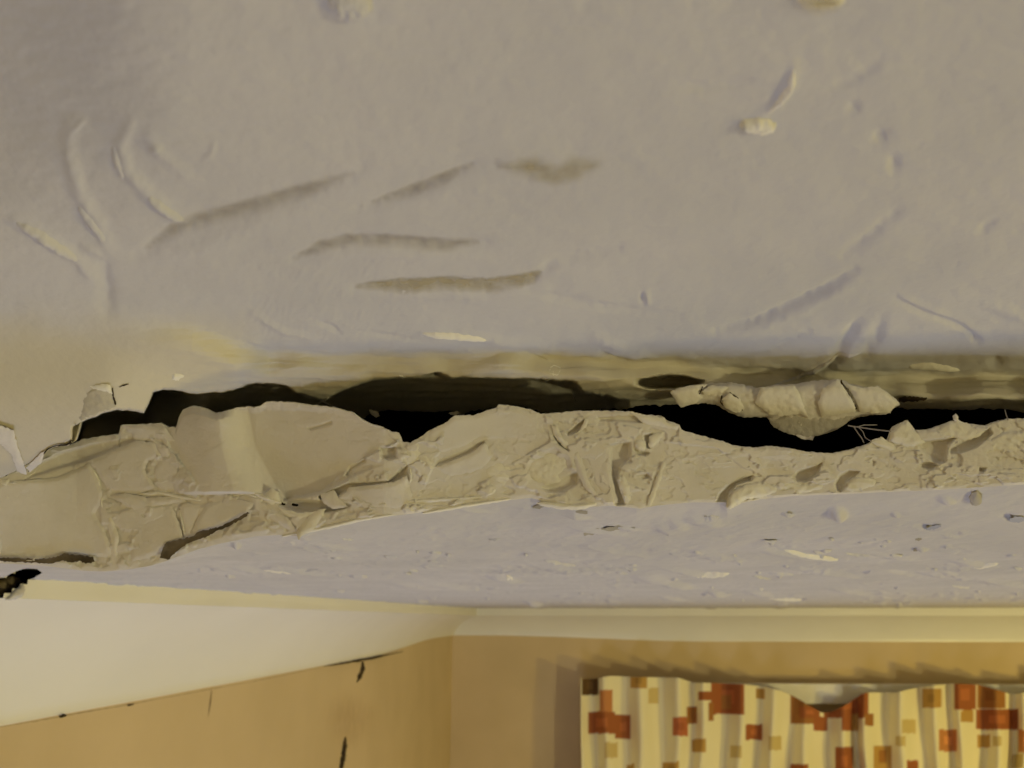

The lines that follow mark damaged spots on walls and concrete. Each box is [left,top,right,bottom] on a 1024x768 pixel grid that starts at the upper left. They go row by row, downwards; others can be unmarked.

spalling [78,384,129,424]
spalling [0,401,1024,600]